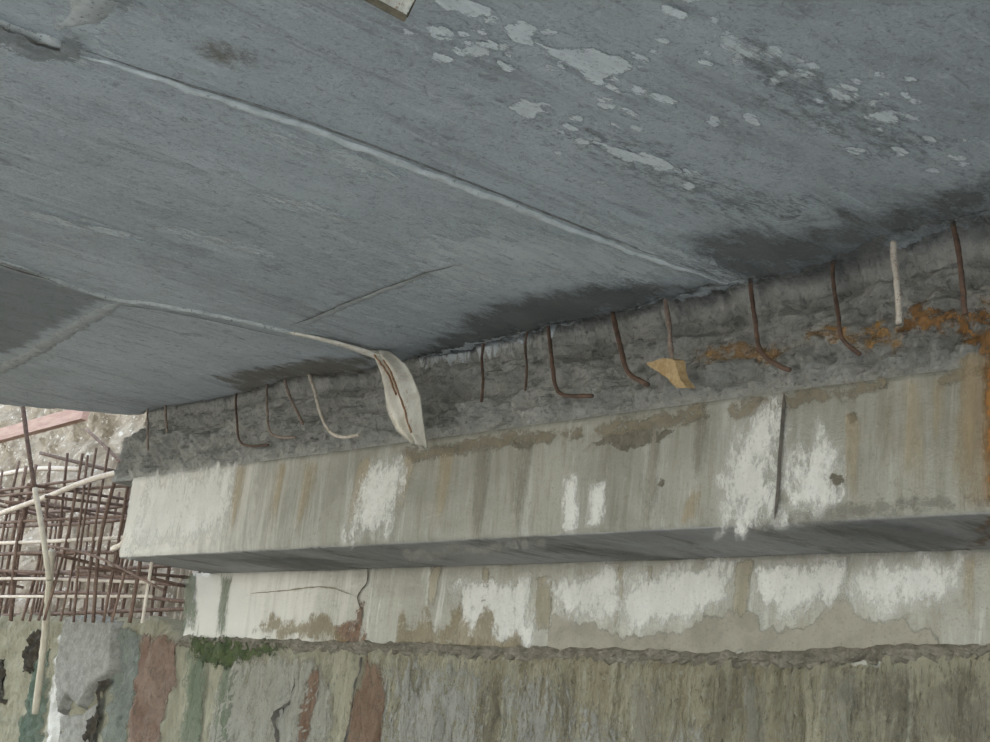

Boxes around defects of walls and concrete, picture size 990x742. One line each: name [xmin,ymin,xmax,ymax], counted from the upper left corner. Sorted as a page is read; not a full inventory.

peeling [427,0,677,131]
peeling [555,113,701,191]
peeling [697,15,784,66]
peeling [814,71,922,132]
spalling [111,210,990,487]
rust [806,295,990,485]
water stain [562,474,606,531]
water stain [716,397,846,535]
water stain [18,635,65,742]
water stain [100,628,333,742]
crack [251,568,368,742]
water stain [396,551,967,666]